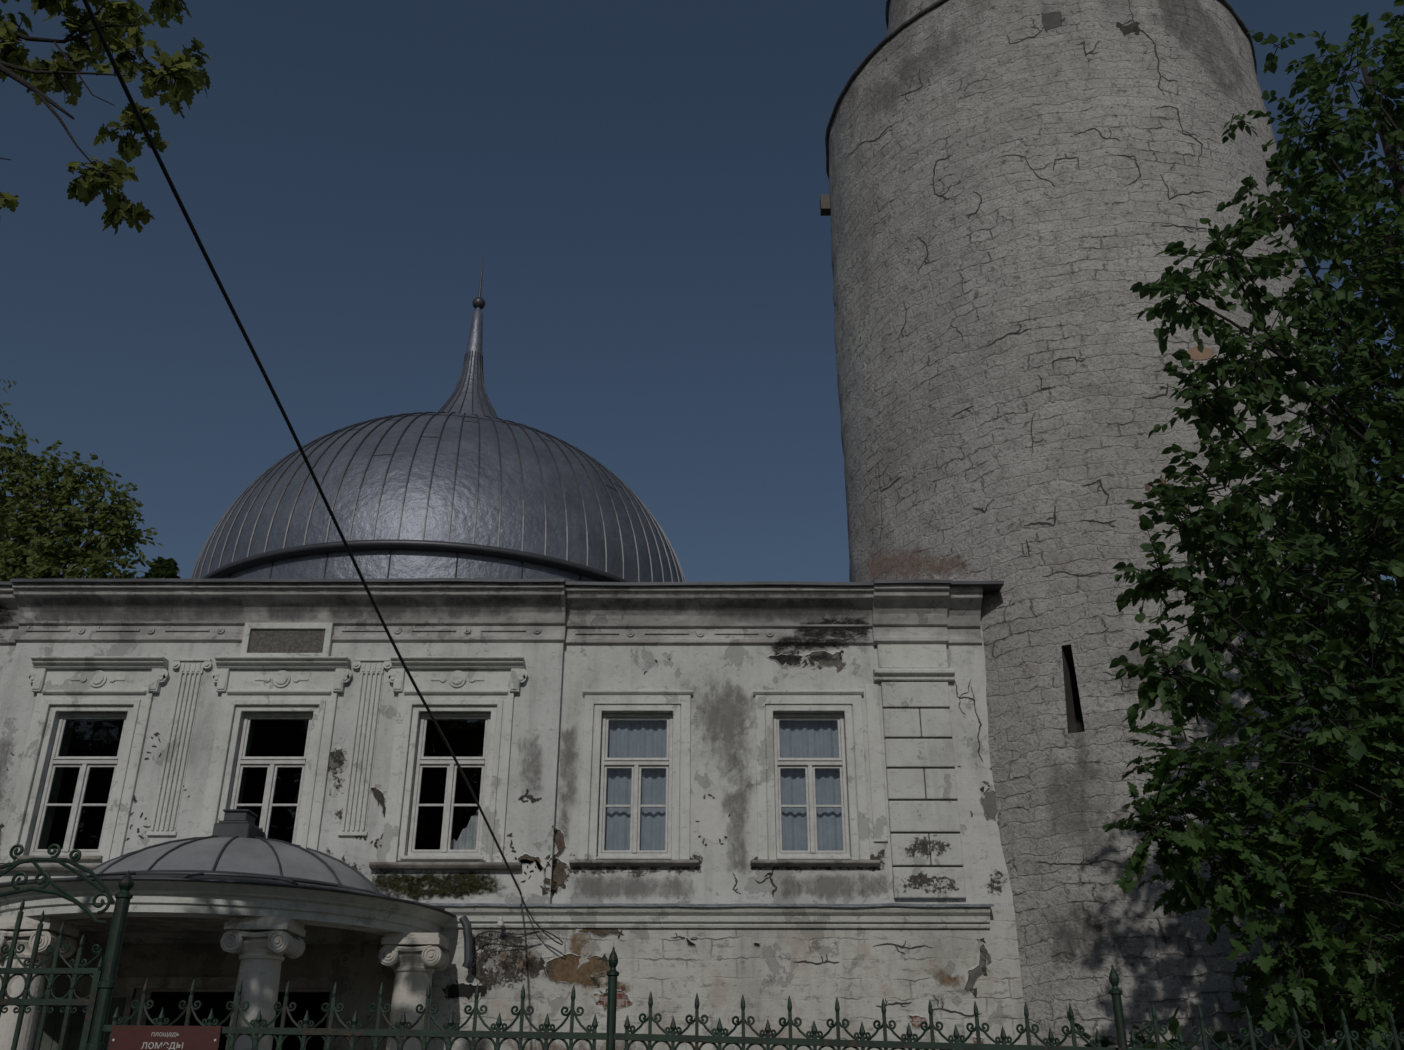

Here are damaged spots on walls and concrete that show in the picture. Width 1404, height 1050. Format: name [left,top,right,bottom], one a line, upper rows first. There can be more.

crack [997,0,1213,232]
crack [932,154,982,218]
crack [1030,357,1085,454]
crack [1024,479,1117,577]
flaking render [766,650,846,673]
water stain [703,686,747,771]
water stain [407,876,475,899]
water stain [724,792,746,868]
flaking render [901,835,959,894]
peeling [970,768,999,826]
flaking render [536,928,633,1011]
flaking render [963,938,991,998]